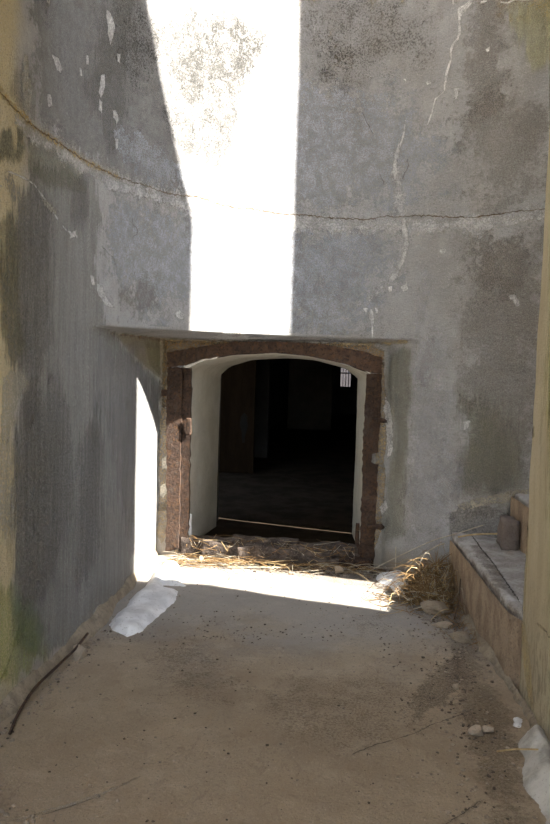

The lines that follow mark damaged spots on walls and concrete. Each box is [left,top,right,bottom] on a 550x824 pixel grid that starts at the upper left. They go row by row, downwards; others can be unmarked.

peeling [106,10,115,45]
crack [0,89,545,239]
damp [0,0,460,658]